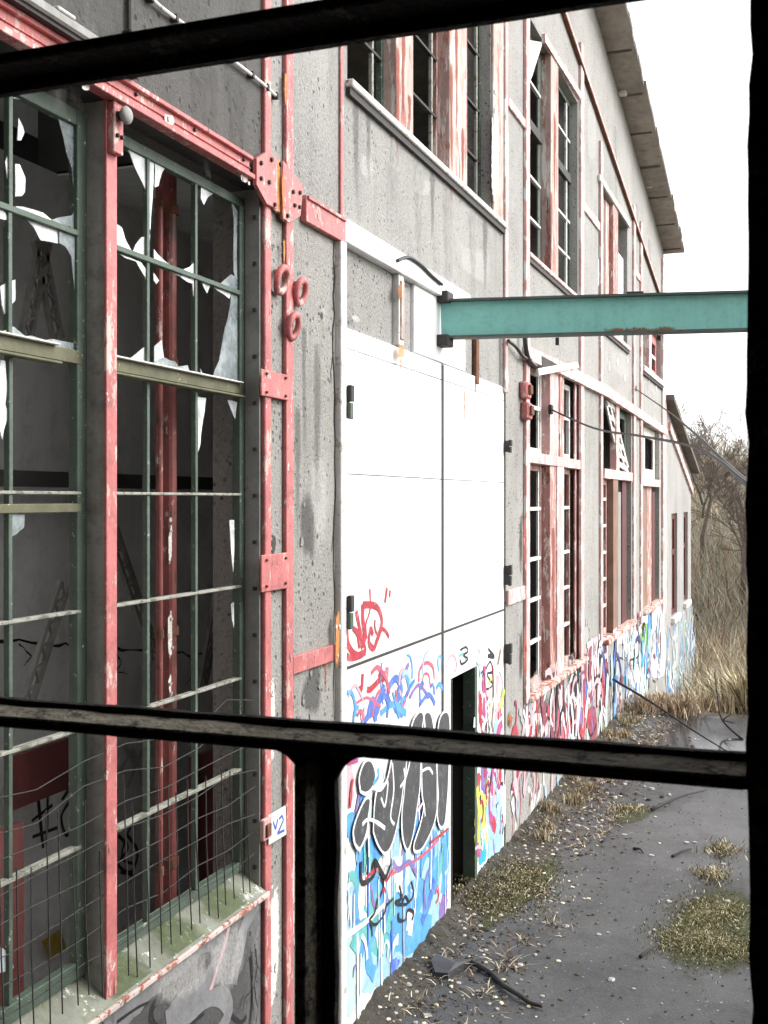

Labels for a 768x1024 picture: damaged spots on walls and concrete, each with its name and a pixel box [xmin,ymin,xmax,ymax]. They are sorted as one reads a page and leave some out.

peeling [491,89,500,202]
peeling [523,629,533,694]